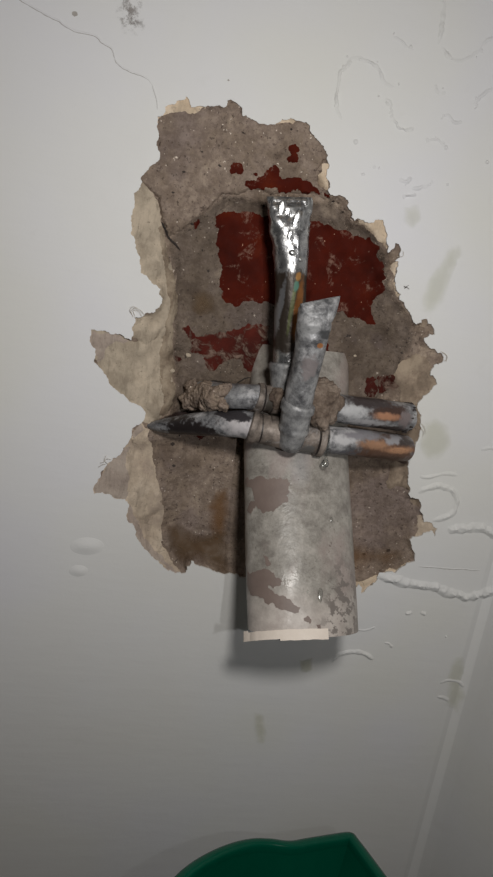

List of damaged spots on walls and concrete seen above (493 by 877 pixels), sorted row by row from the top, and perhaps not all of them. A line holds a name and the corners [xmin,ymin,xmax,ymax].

crack [20,0,159,109]
spalling [90,97,448,629]